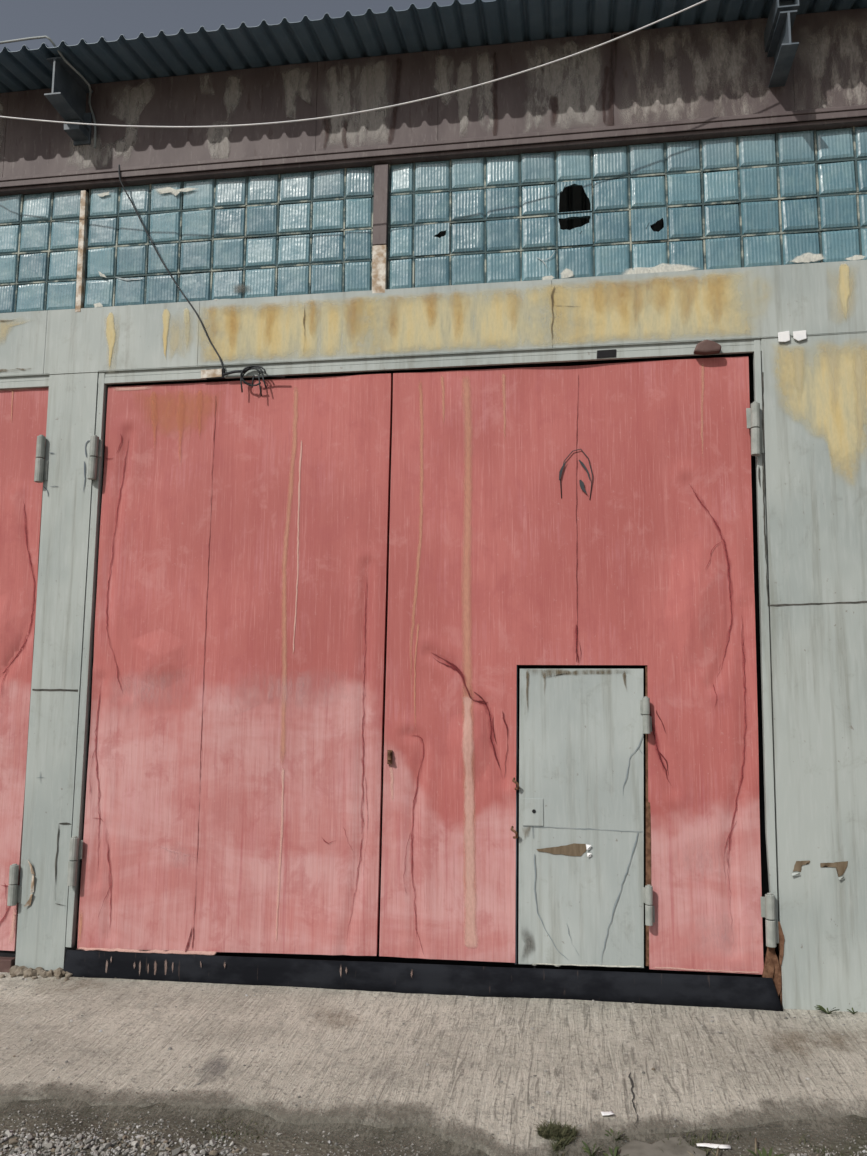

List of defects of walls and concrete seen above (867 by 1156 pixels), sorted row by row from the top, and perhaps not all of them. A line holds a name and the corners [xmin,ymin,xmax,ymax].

peeling [69,82,153,167]
peeling [207,76,241,159]
peeling [282,67,310,120]
peeling [324,61,387,144]
peeling [435,54,494,132]
peeling [527,42,600,129]
peeling [626,28,762,120]
peeling [802,20,867,110]
damp [463,697,476,947]